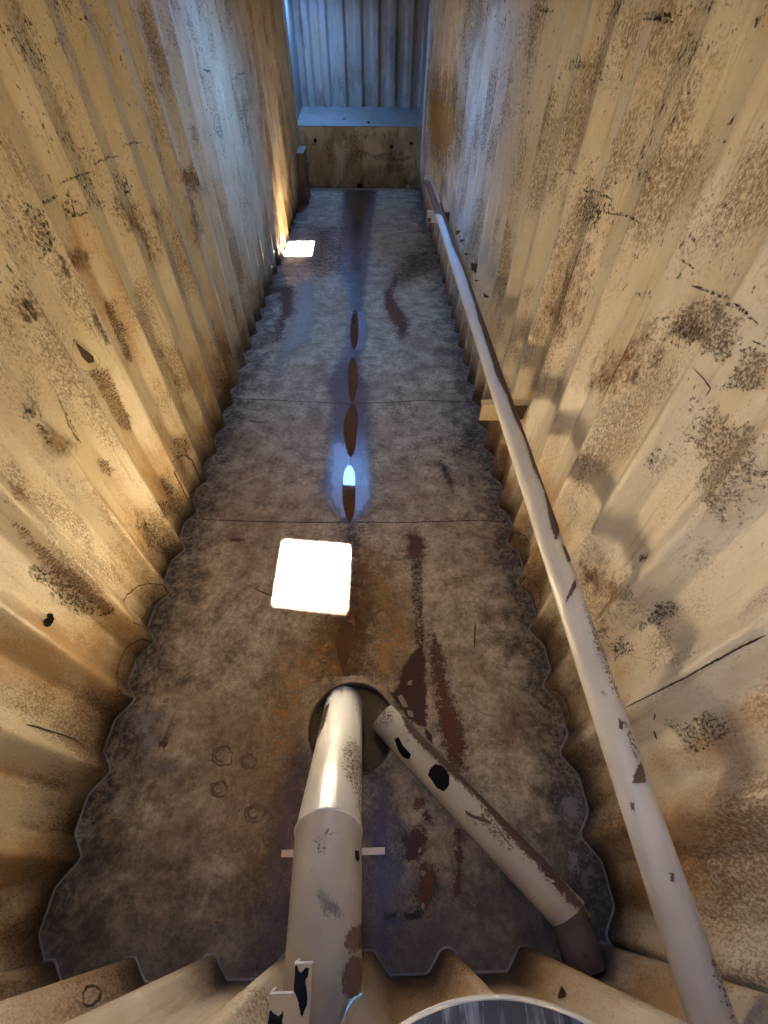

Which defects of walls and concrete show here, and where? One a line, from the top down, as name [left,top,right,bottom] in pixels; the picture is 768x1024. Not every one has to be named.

rust [382,246,437,341]
leakage [310,190,383,680]
rust [403,530,428,560]
rust [424,629,468,776]
crack [625,635,766,708]
rust [449,828,465,899]